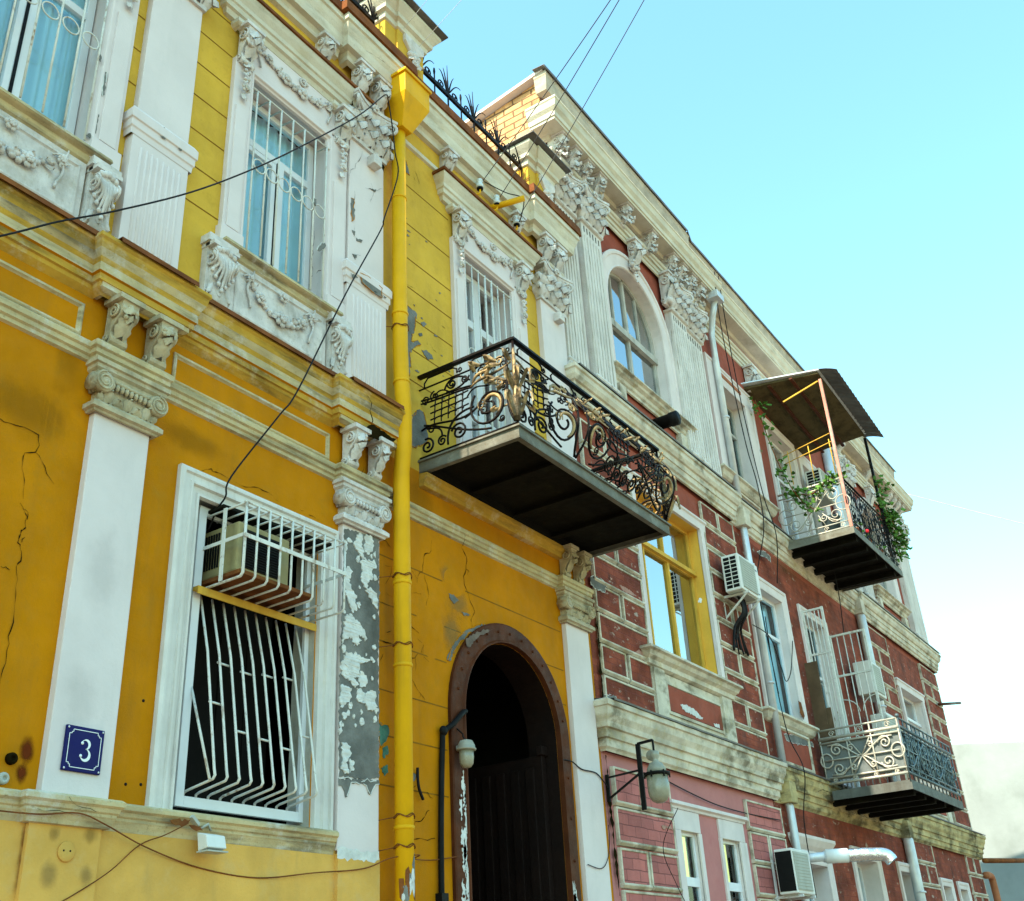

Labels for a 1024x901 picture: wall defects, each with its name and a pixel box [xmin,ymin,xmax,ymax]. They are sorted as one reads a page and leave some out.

spalling [351,198,362,242]
flaking render [408,304,443,377]
crack [0,419,52,681]
spalling [338,529,389,797]
flaking render [447,593,489,661]
peeling [681,704,720,728]
peeling [459,770,469,901]